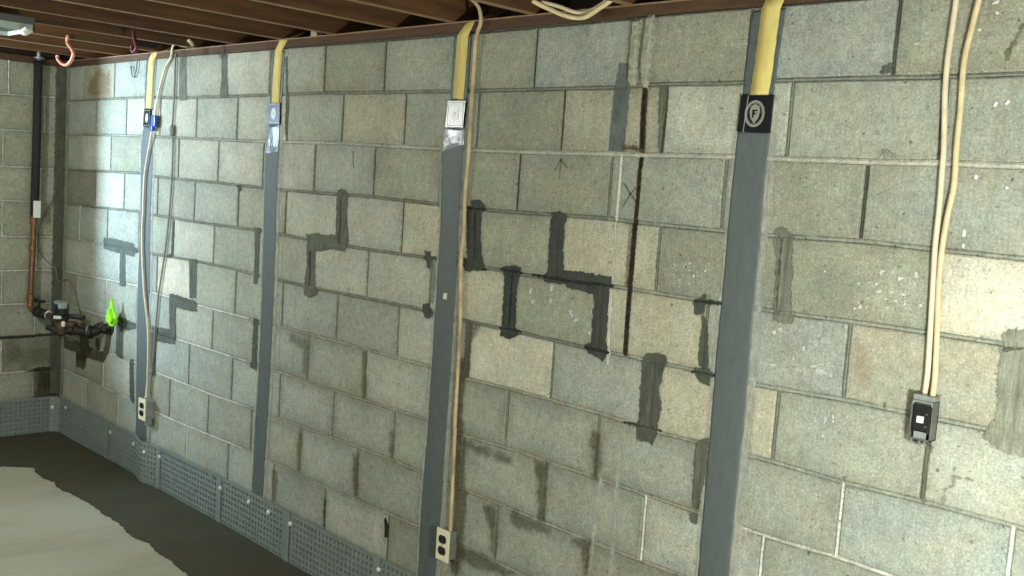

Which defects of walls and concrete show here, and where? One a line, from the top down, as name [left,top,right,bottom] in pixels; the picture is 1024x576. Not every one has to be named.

damp [89,73,109,96]
crack [463,87,668,356]